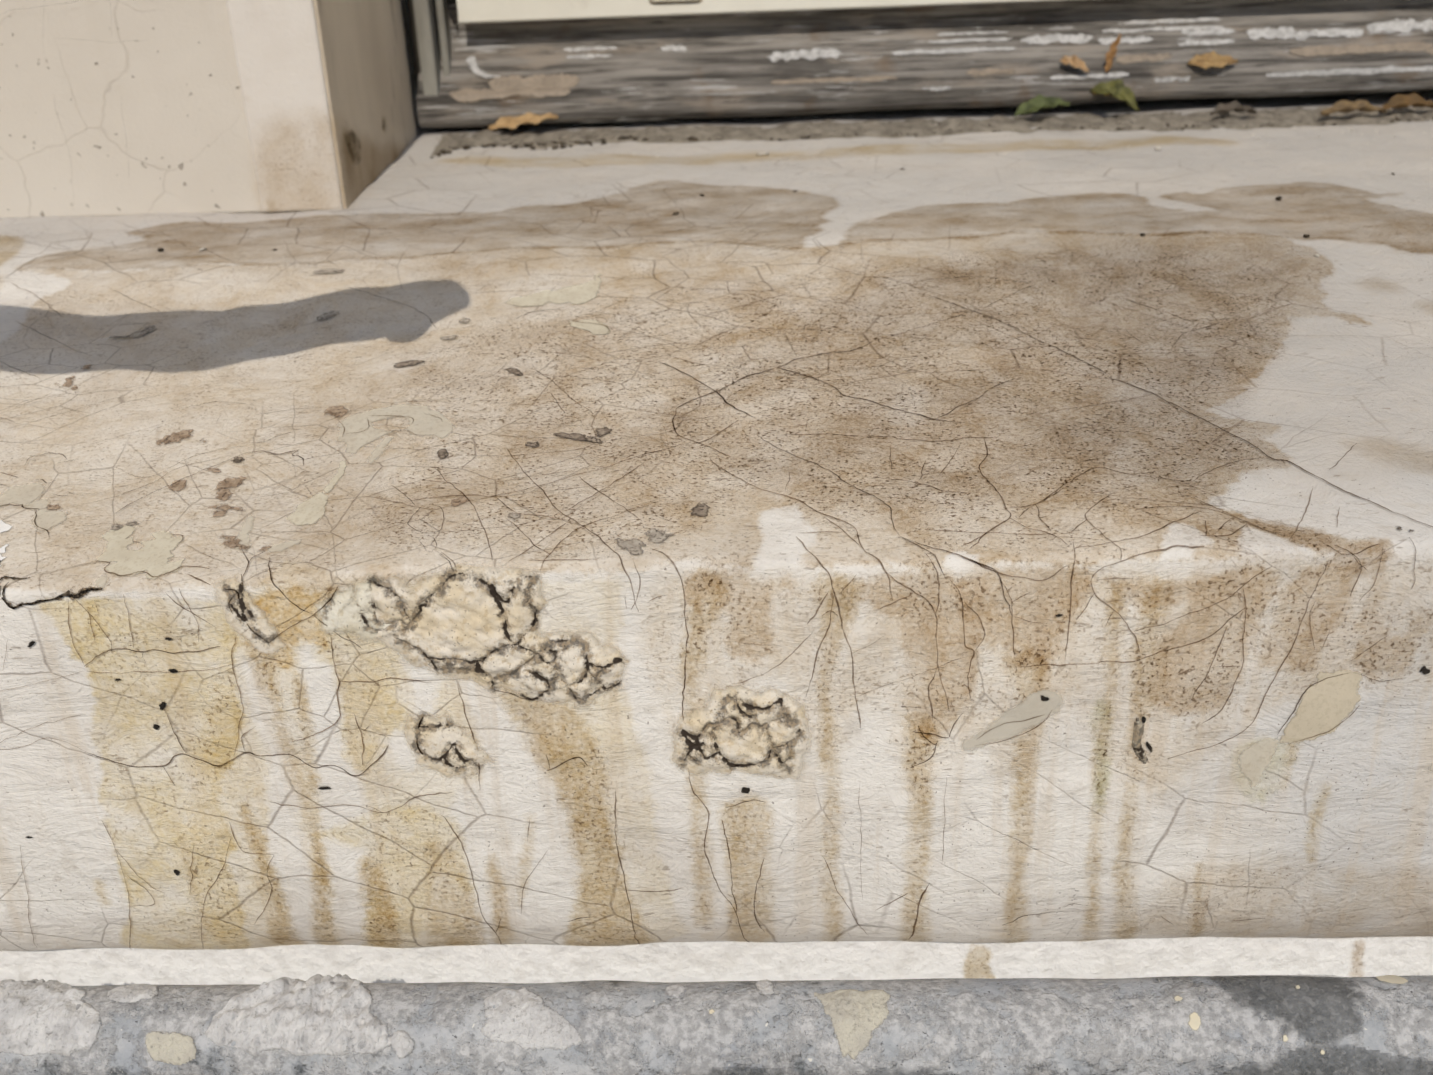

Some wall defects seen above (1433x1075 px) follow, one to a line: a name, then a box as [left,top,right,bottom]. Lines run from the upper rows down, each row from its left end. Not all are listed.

crack [407,276,1433,945]
peeling [963,690,1062,750]
peeling [1280,670,1362,744]